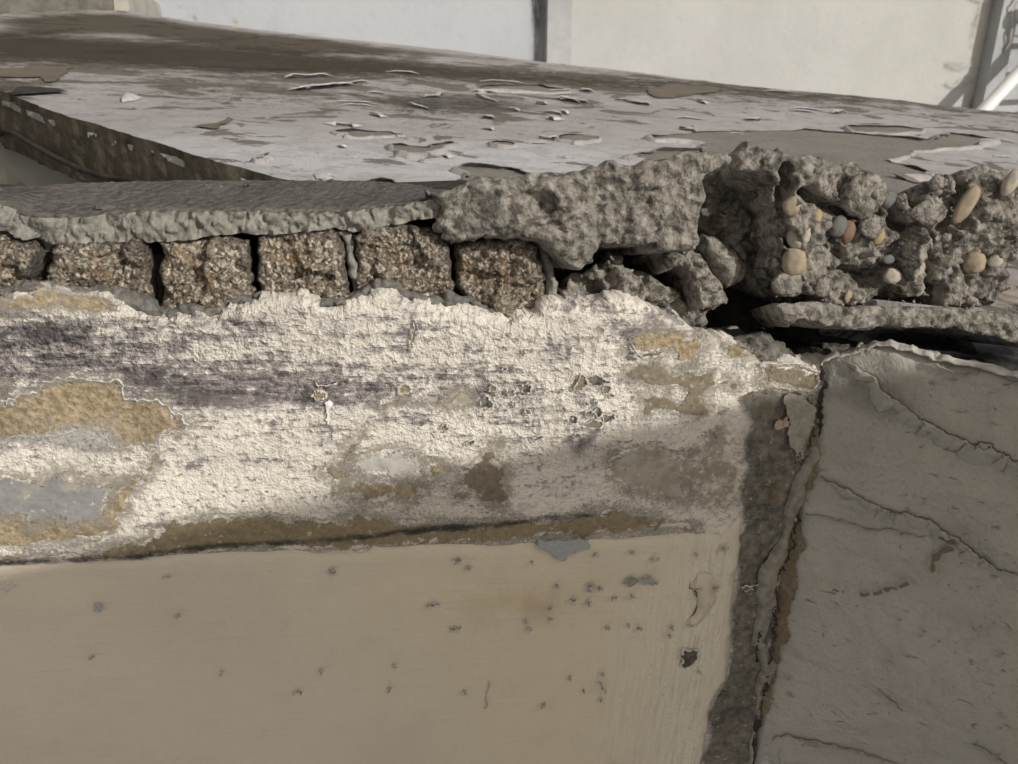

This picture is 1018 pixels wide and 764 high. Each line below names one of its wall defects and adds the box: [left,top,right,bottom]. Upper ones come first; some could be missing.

flaking render [1,86,66,95]
peeling [284,73,387,117]
peeling [469,79,593,120]
peeling [614,84,721,105]
spalling [0,121,1018,423]
leakage [125,372,288,409]
leakage [0,417,129,453]
crack [793,357,1018,473]
peeling [0,367,705,565]
flaking render [704,331,850,764]
crack [747,477,1018,764]
spalling [679,649,702,675]